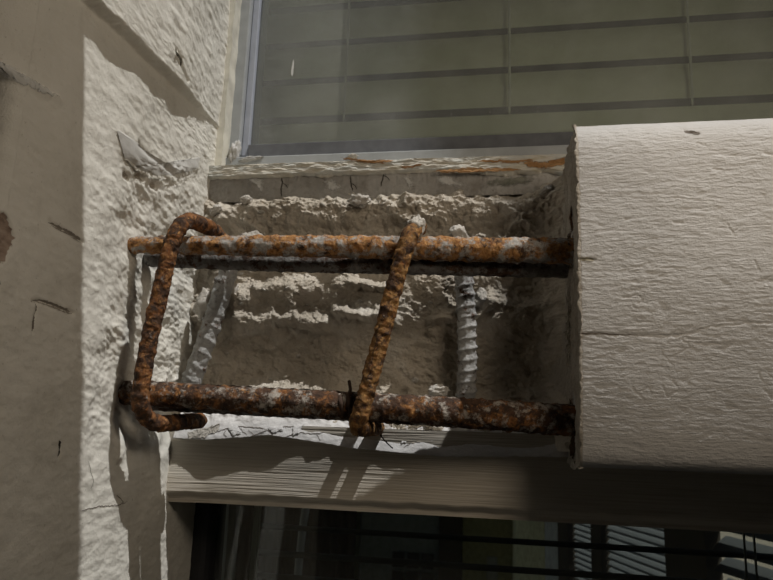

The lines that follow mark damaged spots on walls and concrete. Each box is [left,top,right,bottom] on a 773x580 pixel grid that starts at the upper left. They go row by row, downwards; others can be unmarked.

corrosion [437,157,565,173]
spalling [0,212,15,277]
spalling [127,235,166,267]
spalling [150,176,576,452]
crack [578,329,634,337]
spalling [118,380,133,405]